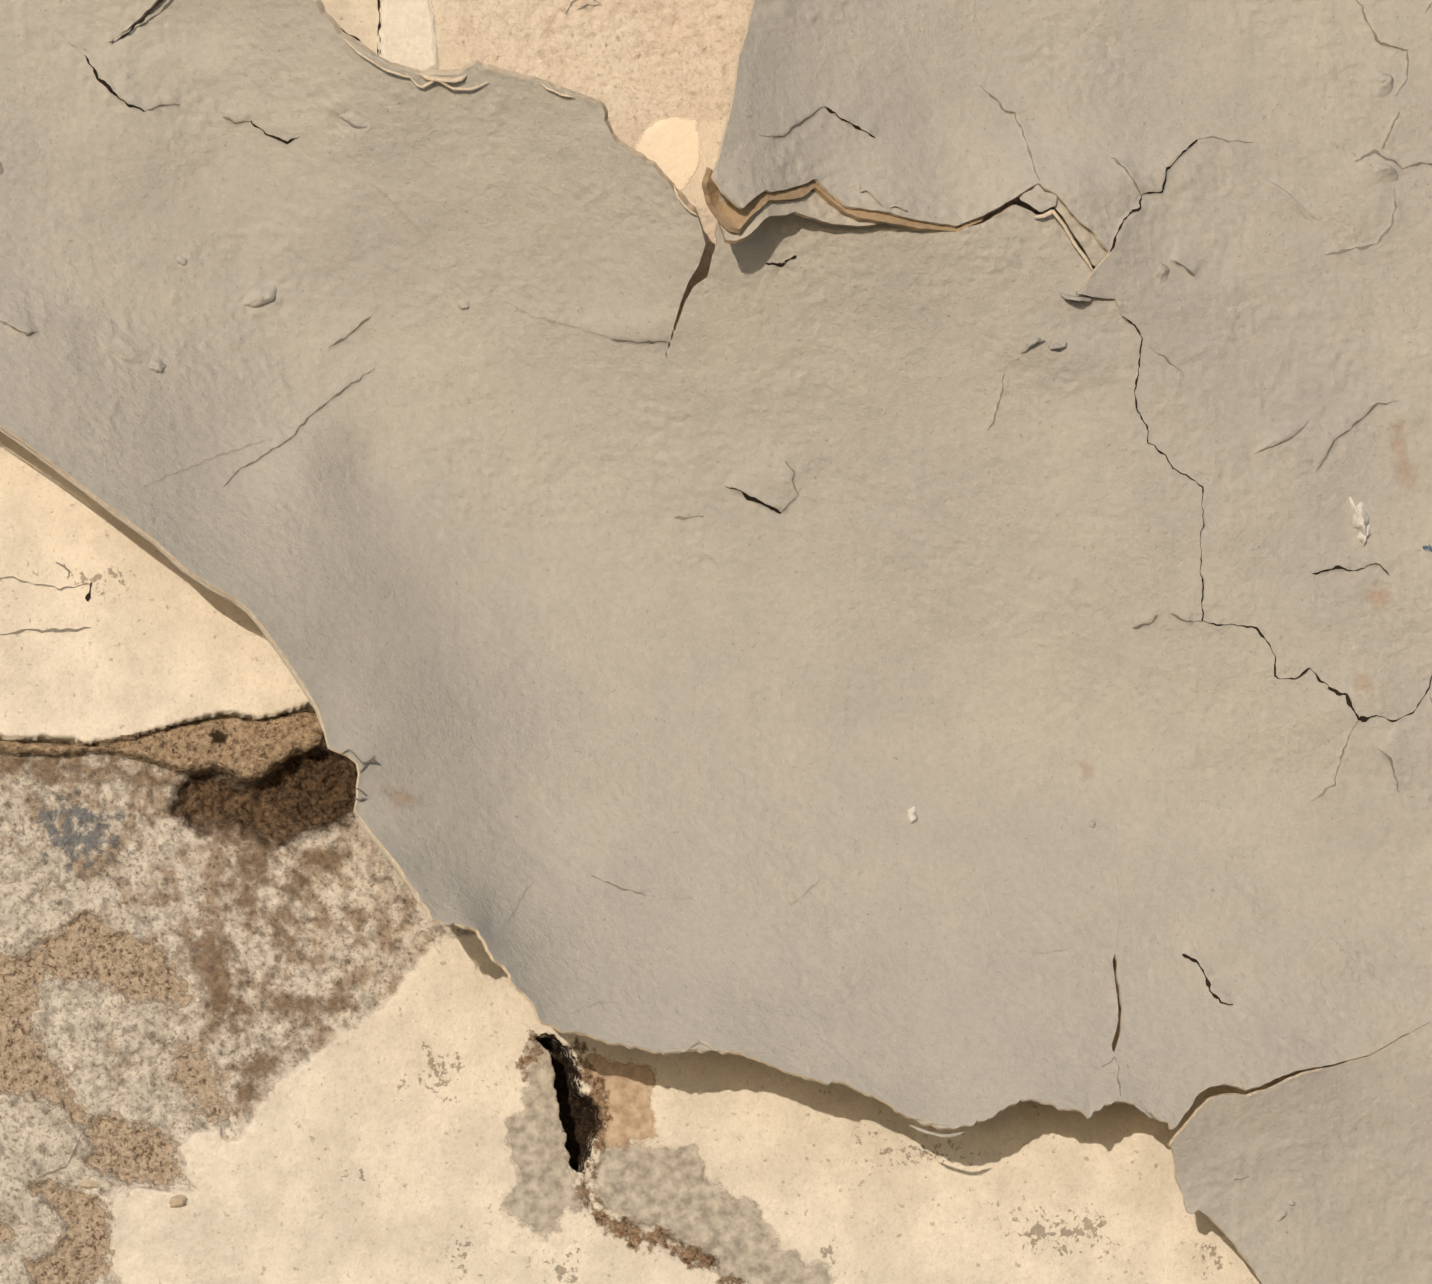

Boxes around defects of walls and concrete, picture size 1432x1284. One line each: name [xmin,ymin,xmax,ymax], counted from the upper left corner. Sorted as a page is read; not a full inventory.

peeling [39,0,158,42]
crack [1110,123,1252,252]
peeling [702,0,1432,720]
crack [1122,316,1432,801]
crack [0,627,91,635]
flaking render [0,711,324,783]
damp [36,788,131,889]
damp [192,814,279,915]
damp [187,932,251,1033]
crack [1182,954,1233,1005]
flaking render [0,909,196,1284]
damp [502,1038,831,1284]